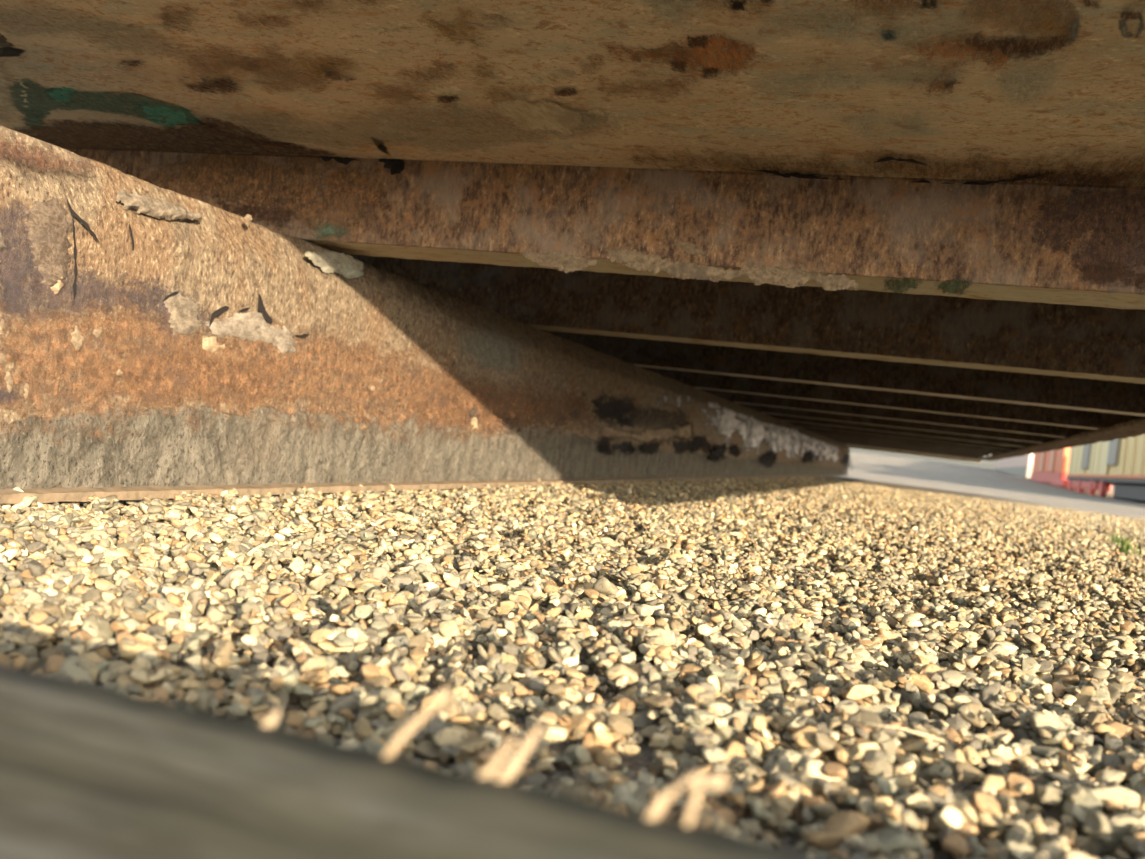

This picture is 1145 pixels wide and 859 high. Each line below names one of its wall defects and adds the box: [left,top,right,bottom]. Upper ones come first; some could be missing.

corrosion [582,35,766,99]
peeling [305,224,364,279]
peeling [68,322,102,350]
peeling [162,290,309,354]
peeling [0,351,31,403]
damp [658,395,839,462]